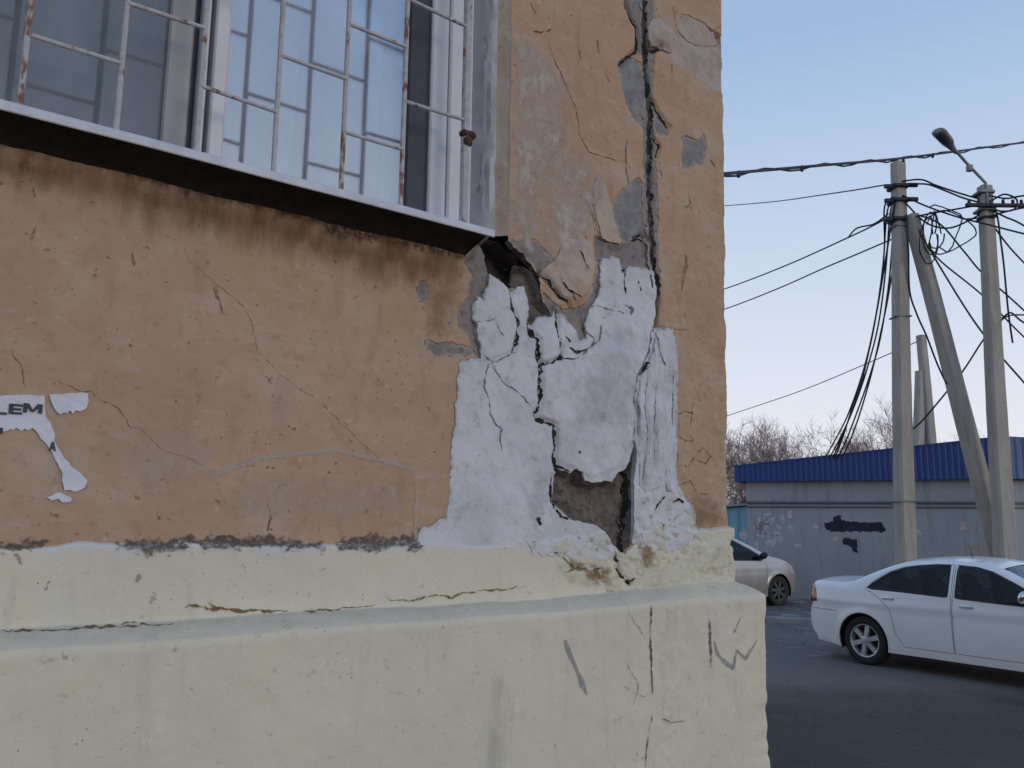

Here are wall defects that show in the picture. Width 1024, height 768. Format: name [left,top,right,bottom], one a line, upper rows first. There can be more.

peeling [424,0,722,358]
crack [476,0,688,584]
crack [59,381,215,472]
spalling [527,453,700,560]
crack [5,586,526,632]
crack [624,605,683,759]
crack [707,620,715,662]